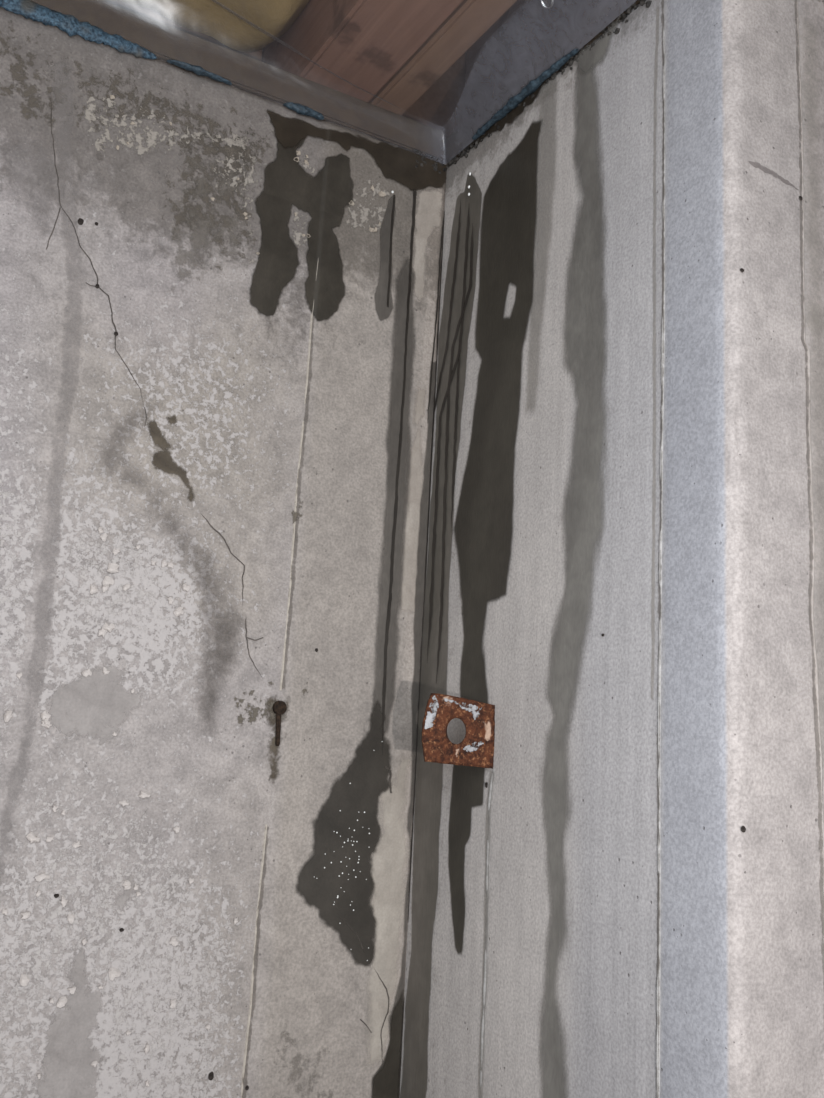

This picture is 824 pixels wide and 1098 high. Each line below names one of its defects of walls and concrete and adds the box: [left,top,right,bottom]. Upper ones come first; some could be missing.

crack [46,102,147,426]
crack [202,515,263,675]
water stain [0,27,541,1098]
corrosion [267,698,288,780]
water stain [541,23,617,1098]